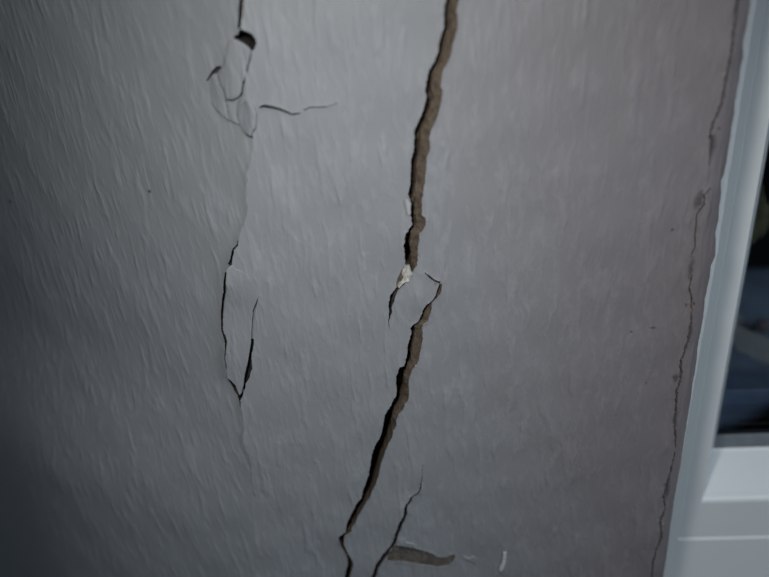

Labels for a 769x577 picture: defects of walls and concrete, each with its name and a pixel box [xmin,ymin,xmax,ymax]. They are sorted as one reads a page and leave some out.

peeling [206,39,257,136]
crack [259,103,337,115]
crack [708,0,739,163]
crack [691,188,711,255]
peeling [223,265,259,395]
crack [339,0,459,577]
crack [651,275,693,576]
spalling [387,538,478,567]